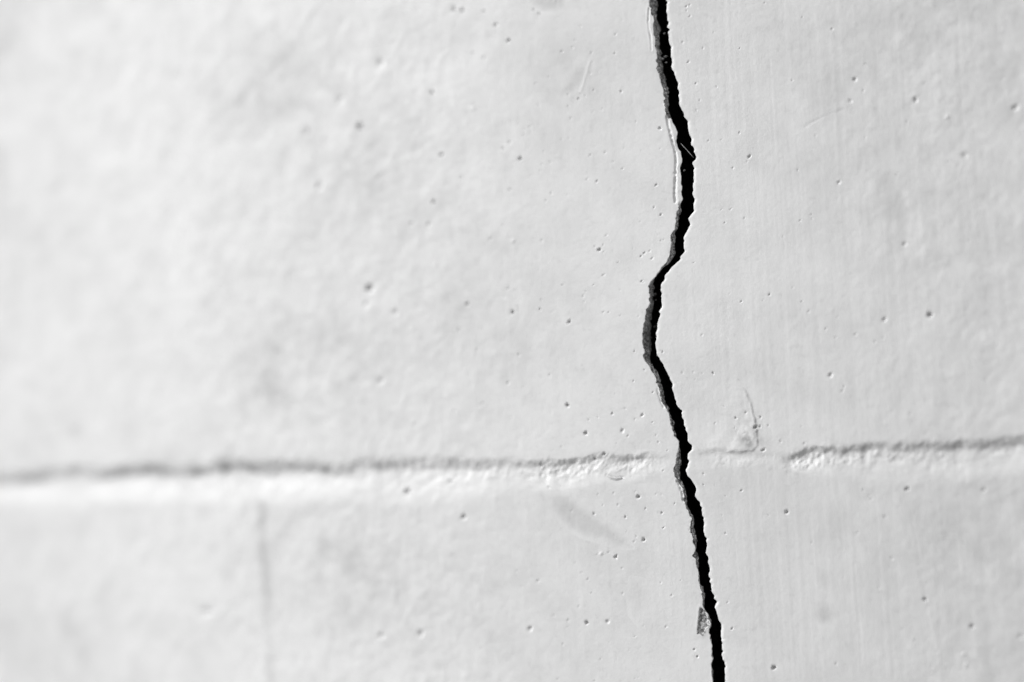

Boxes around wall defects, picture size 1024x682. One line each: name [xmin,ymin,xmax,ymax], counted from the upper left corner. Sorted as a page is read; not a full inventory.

crack [643,0,729,682]